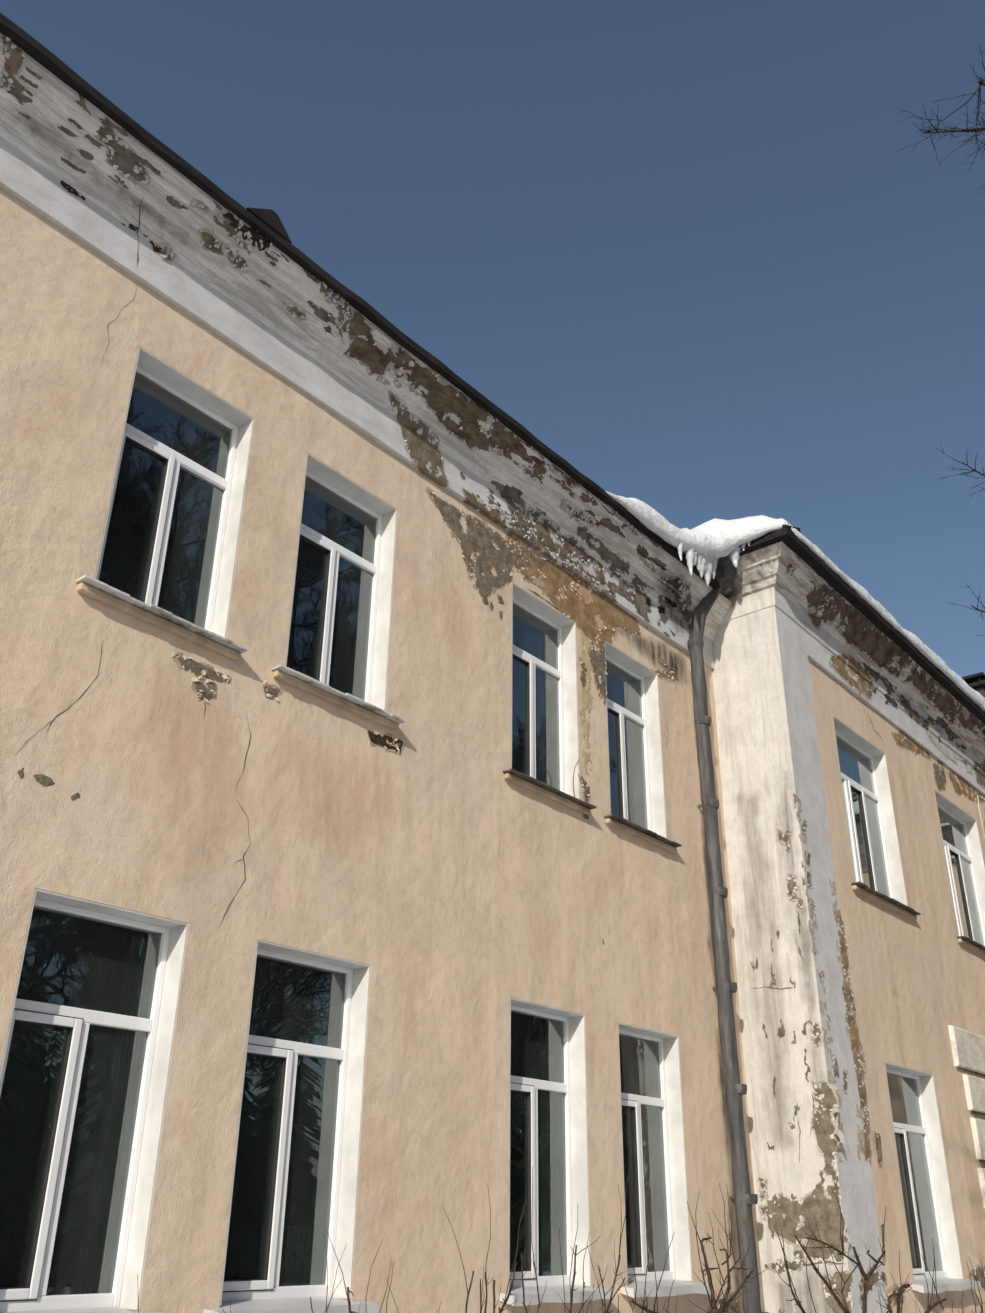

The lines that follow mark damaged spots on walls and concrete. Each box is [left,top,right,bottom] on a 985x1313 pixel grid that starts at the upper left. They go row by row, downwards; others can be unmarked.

spalling [0,33,42,119]
spalling [57,93,163,201]
crack [102,198,143,361]
spalling [121,222,177,266]
spalling [166,196,290,288]
spalling [280,269,694,820]
crack [22,641,103,748]
spalling [171,651,232,703]
spalling [785,556,985,804]
spalling [18,768,55,787]
crack [220,714,251,925]
spalling [757,793,905,1313]